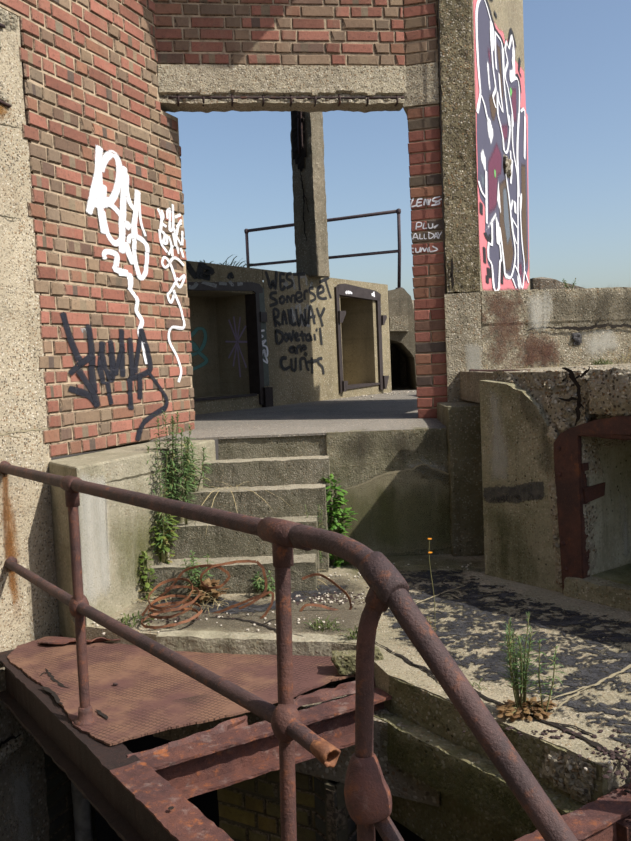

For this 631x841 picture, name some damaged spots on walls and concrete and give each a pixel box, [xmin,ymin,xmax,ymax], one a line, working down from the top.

spalling [163,94,404,171]
crack [300,171,309,241]
crack [526,317,631,331]
crack [559,367,590,426]
rust [3,474,17,559]
crack [552,664,631,711]